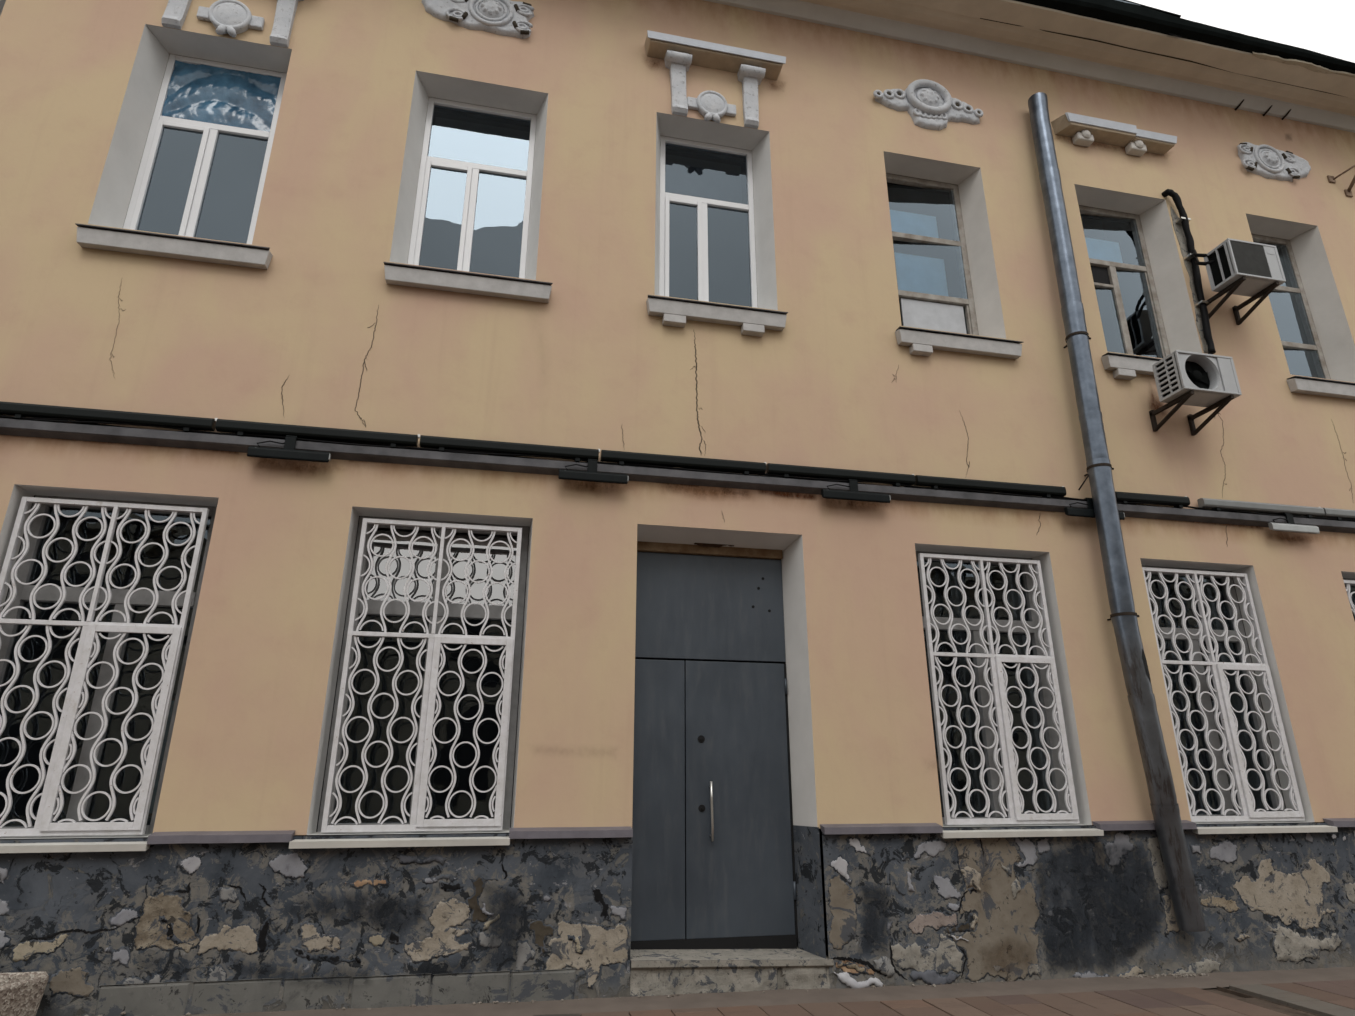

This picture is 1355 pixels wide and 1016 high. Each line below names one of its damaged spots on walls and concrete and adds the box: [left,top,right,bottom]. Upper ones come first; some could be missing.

crack [109,279,126,378]
crack [353,305,379,428]
crack [690,332,708,456]
crack [1215,408,1228,547]
crack [1331,419,1353,502]
spalling [0,868,70,962]
spalling [104,892,258,986]
peeling [178,854,202,876]
spalling [299,921,342,953]
spalling [367,854,630,990]
spalling [827,836,1053,989]
spalling [1190,830,1355,930]